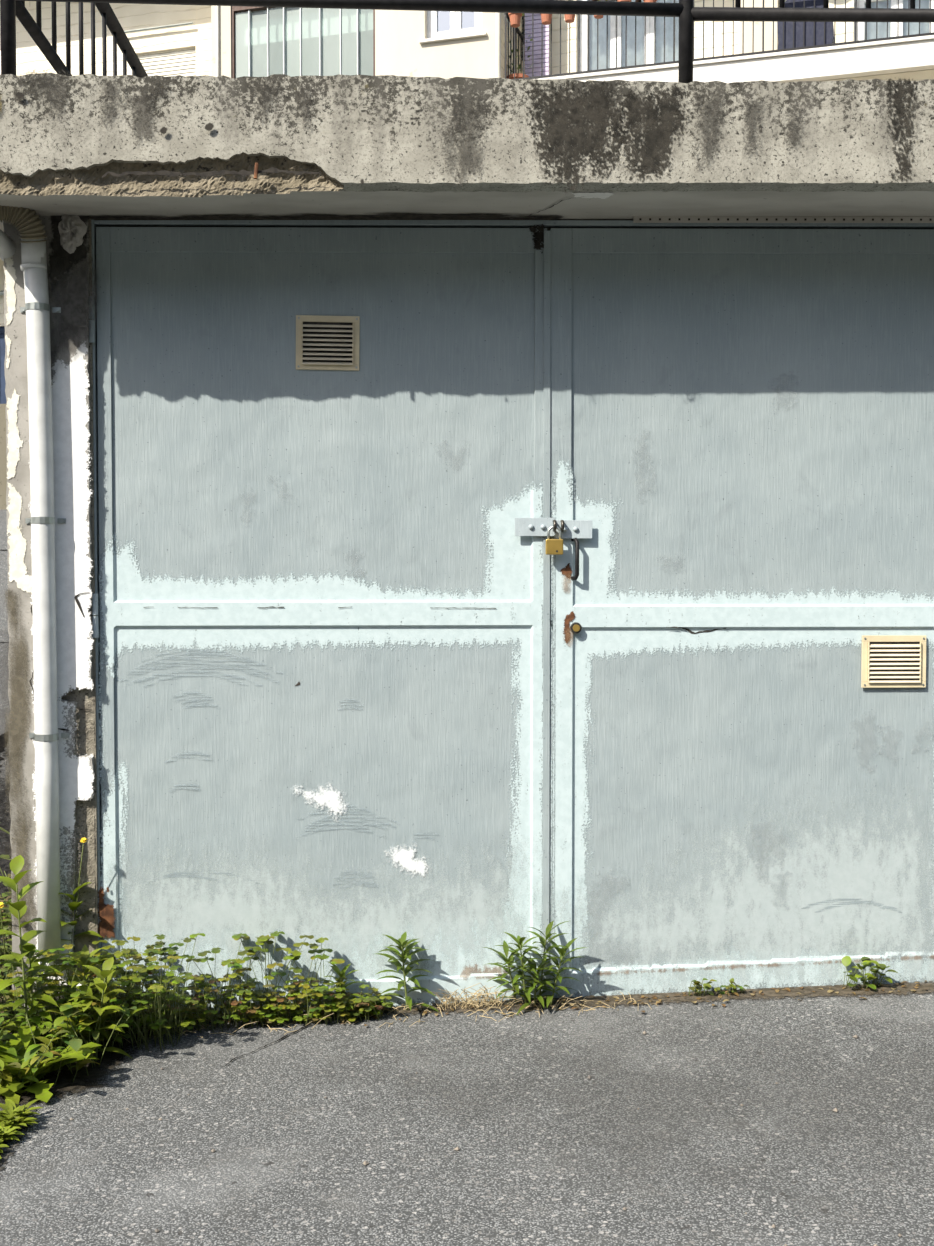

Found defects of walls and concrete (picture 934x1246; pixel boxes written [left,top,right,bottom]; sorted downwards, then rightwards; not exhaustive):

leakage [14,69,73,117]
leakage [99,79,170,142]
leakage [249,78,279,123]
leakage [442,93,492,186]
leakage [521,79,723,193]
leakage [743,97,764,159]
leakage [782,105,802,151]
leakage [886,79,918,181]
spalling [0,153,344,197]
crack [74,592,90,617]
crack [0,732,8,772]